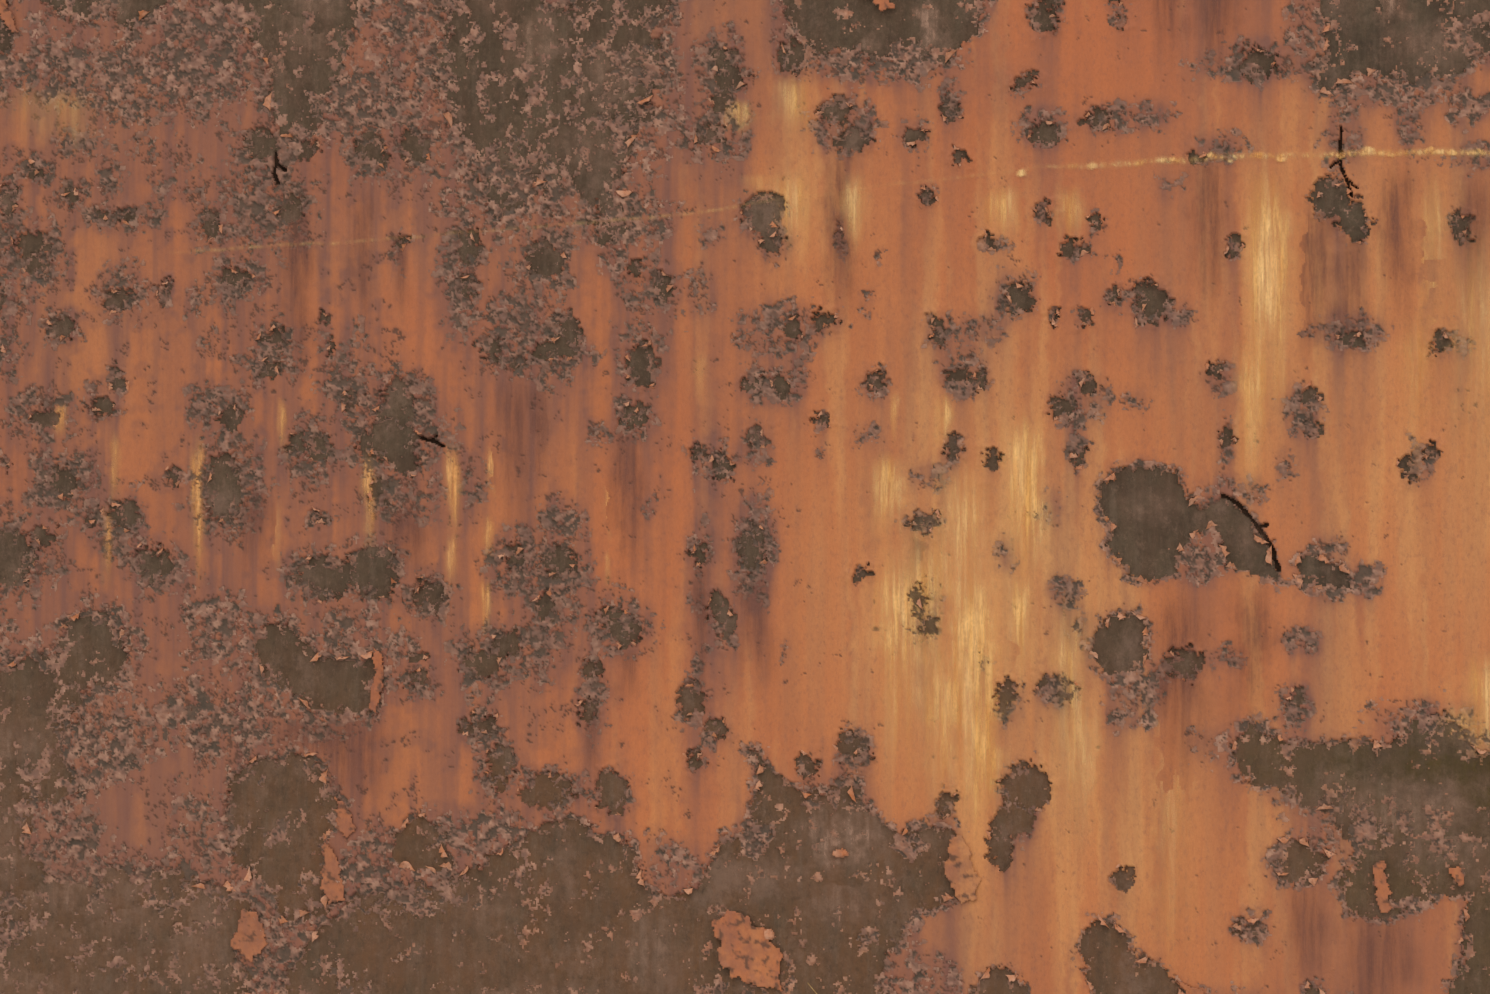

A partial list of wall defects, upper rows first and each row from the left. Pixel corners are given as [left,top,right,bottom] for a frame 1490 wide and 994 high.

peeling [0,0,694,278]
peeling [774,0,999,94]
corrosion [977,198,1176,329]
crack [1136,126,1483,198]
corrosion [0,122,681,816]
peeling [0,572,1031,994]
corrosion [681,295,853,657]
corrosion [853,562,1082,874]
corrosion [921,309,1116,543]
peeling [1064,459,1388,737]
crack [1221,494,1281,572]
peeling [1186,686,1490,994]